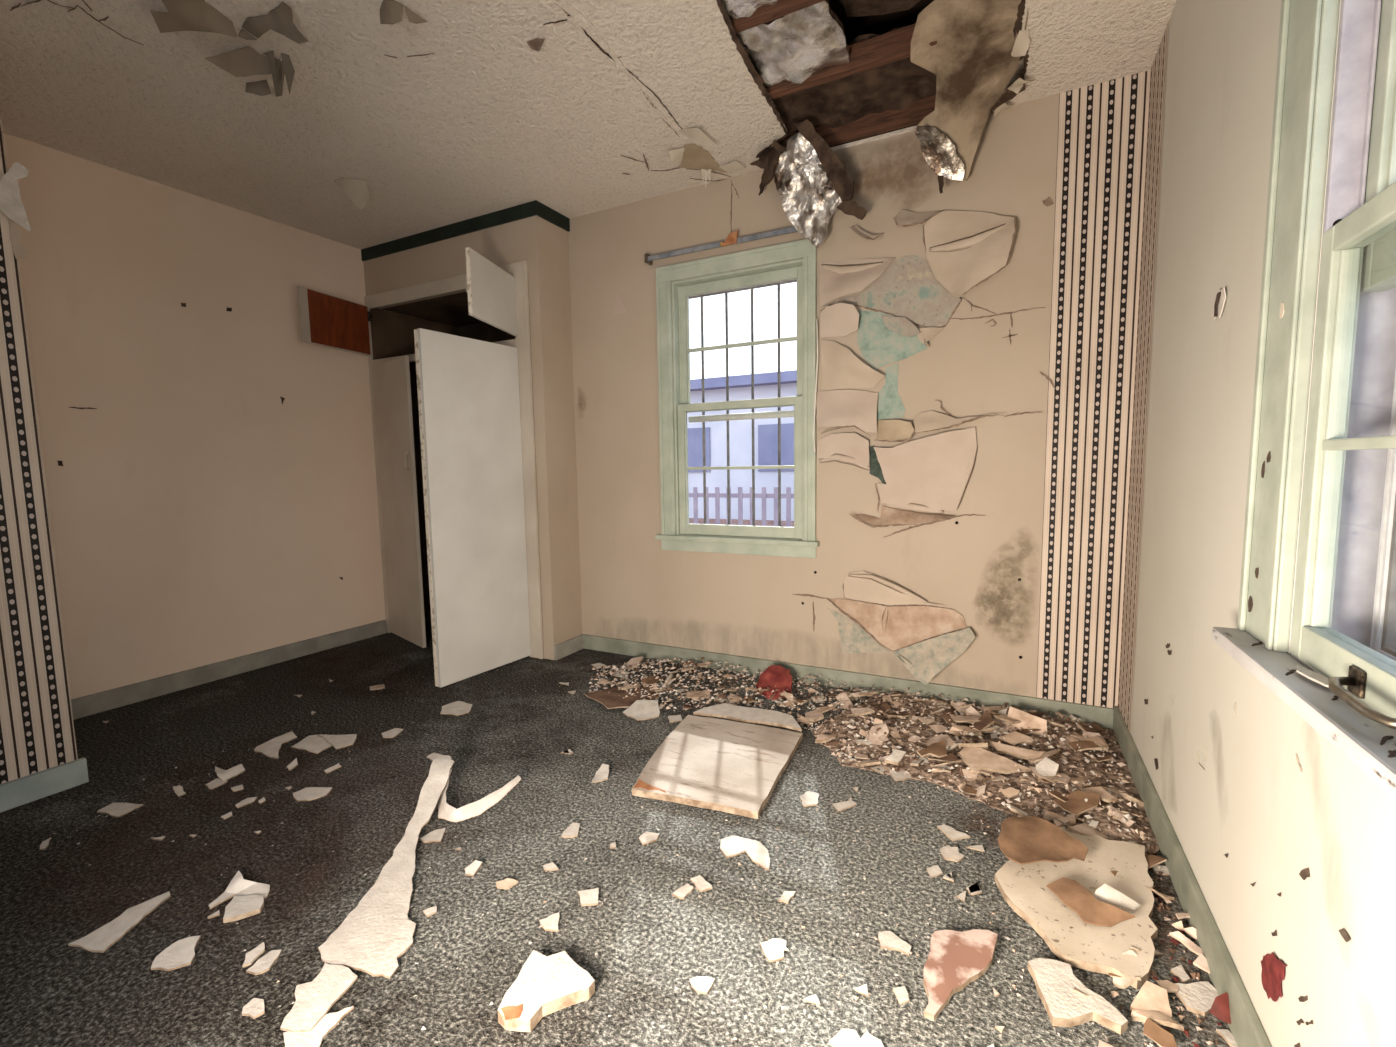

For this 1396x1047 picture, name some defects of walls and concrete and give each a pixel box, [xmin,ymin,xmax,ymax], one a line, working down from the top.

peeling [150,0,308,97]
peeling [380,0,427,25]
crack [384,51,435,59]
crack [543,0,684,141]
peeling [816,209,1040,537]
peeling [793,571,975,685]